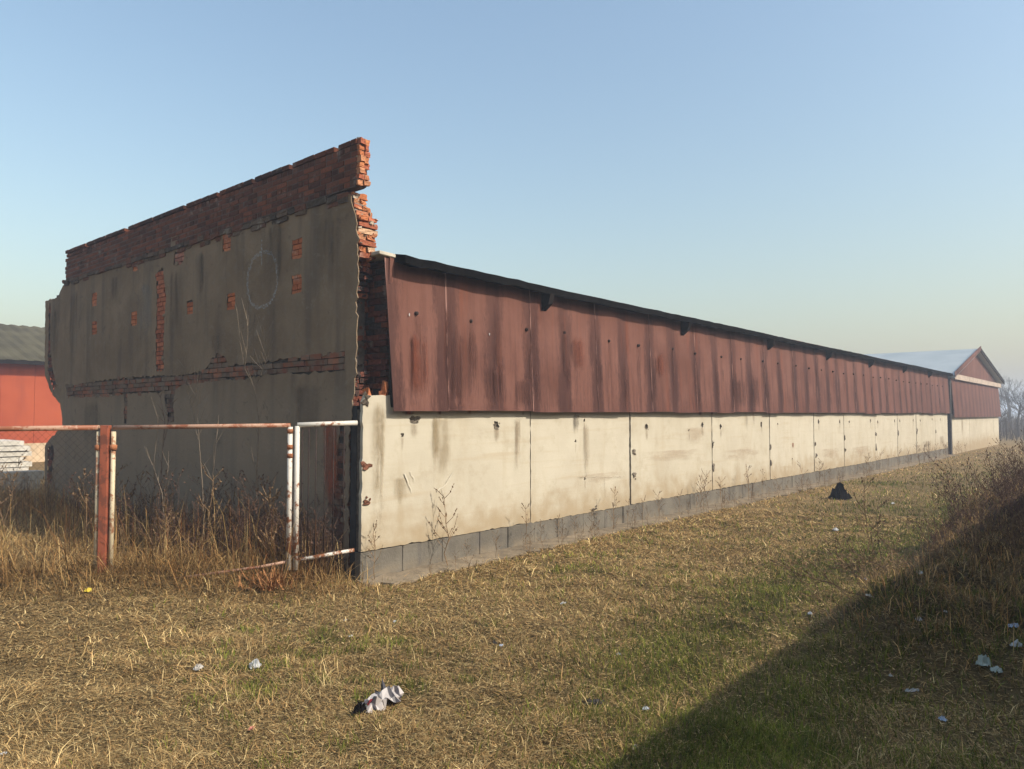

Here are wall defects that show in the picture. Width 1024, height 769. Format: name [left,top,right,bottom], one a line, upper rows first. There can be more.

peeling [154,271,166,372]
spalling [361,381,389,407]